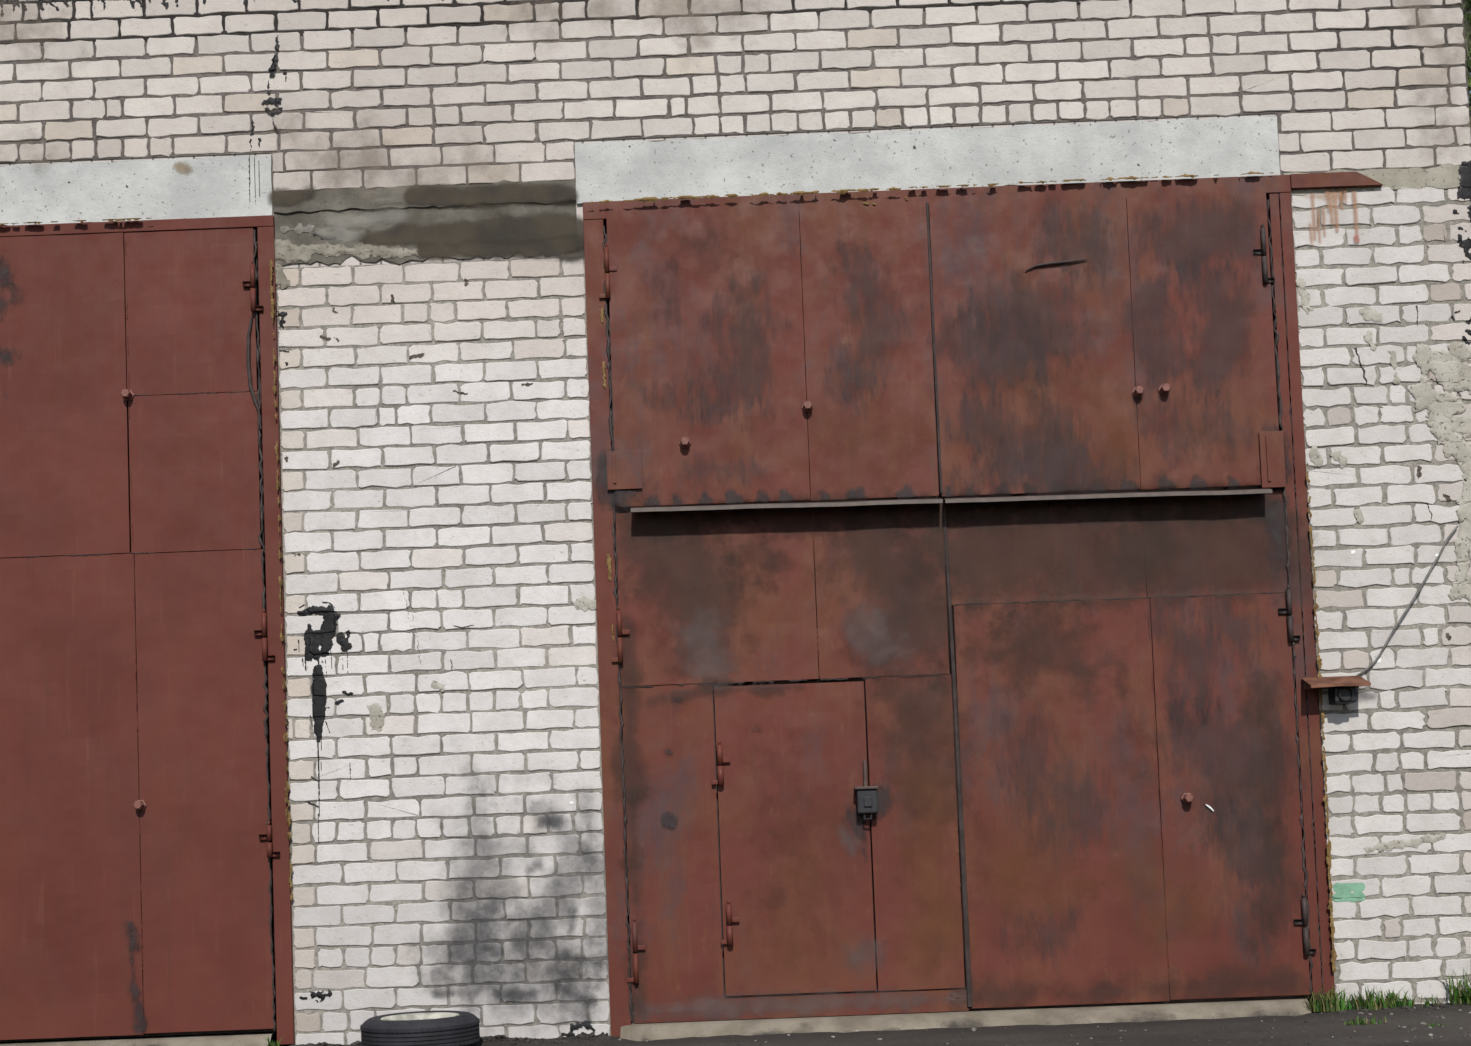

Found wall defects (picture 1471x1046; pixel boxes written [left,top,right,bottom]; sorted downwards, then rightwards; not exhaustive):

corrosion [1311,189,1360,243]